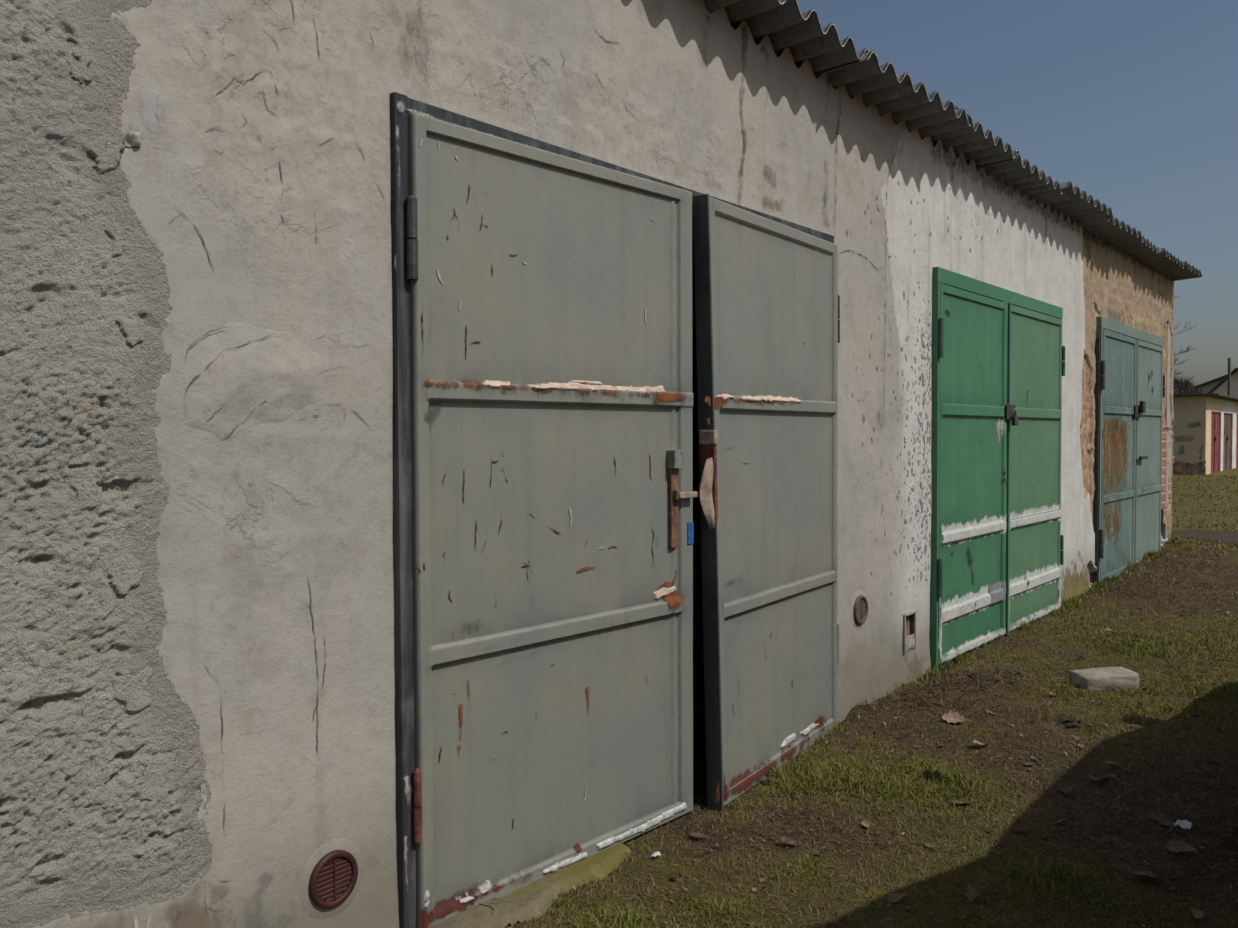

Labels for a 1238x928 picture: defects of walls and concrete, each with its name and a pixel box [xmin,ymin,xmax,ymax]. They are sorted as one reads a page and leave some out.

crack [204,0,387,241]
crack [169,184,216,274]
spalling [0,0,213,928]
spalling [1080,349,1094,505]
crack [308,579,326,754]